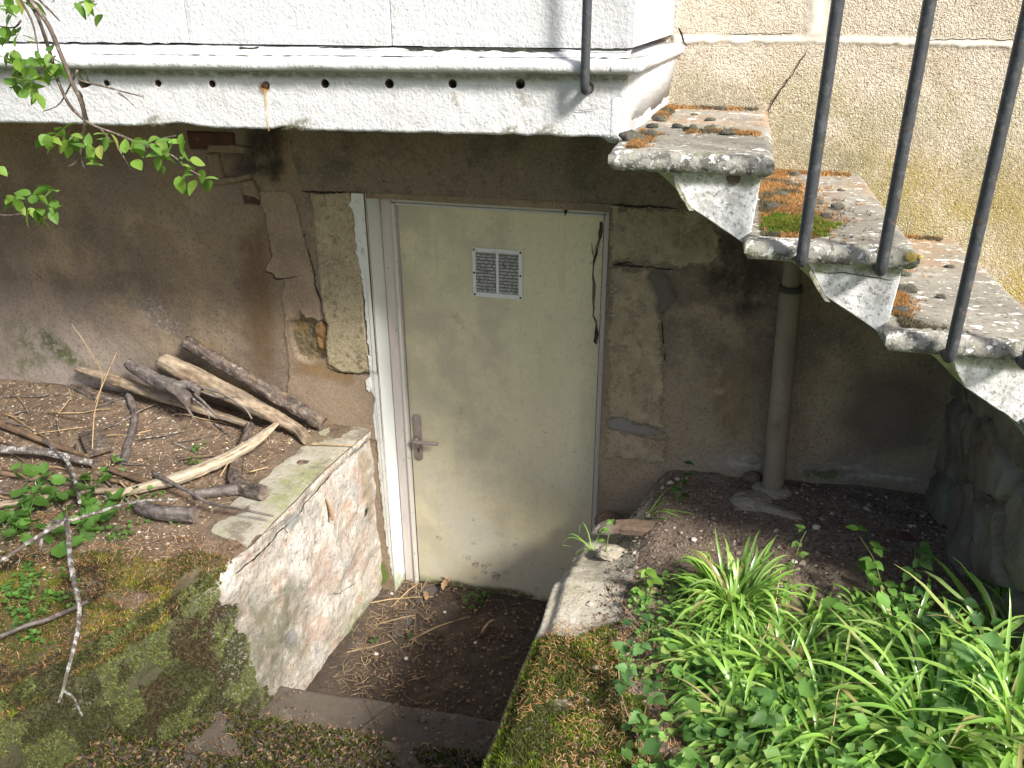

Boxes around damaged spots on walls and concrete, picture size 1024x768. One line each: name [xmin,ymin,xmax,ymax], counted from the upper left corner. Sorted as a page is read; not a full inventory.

crack [723,33,808,113]
corrosion [260,82,270,131]
flaking render [187,131,261,205]
crack [611,202,677,210]
crack [612,261,675,270]
spalling [293,315,327,360]
crack [237,441,366,573]